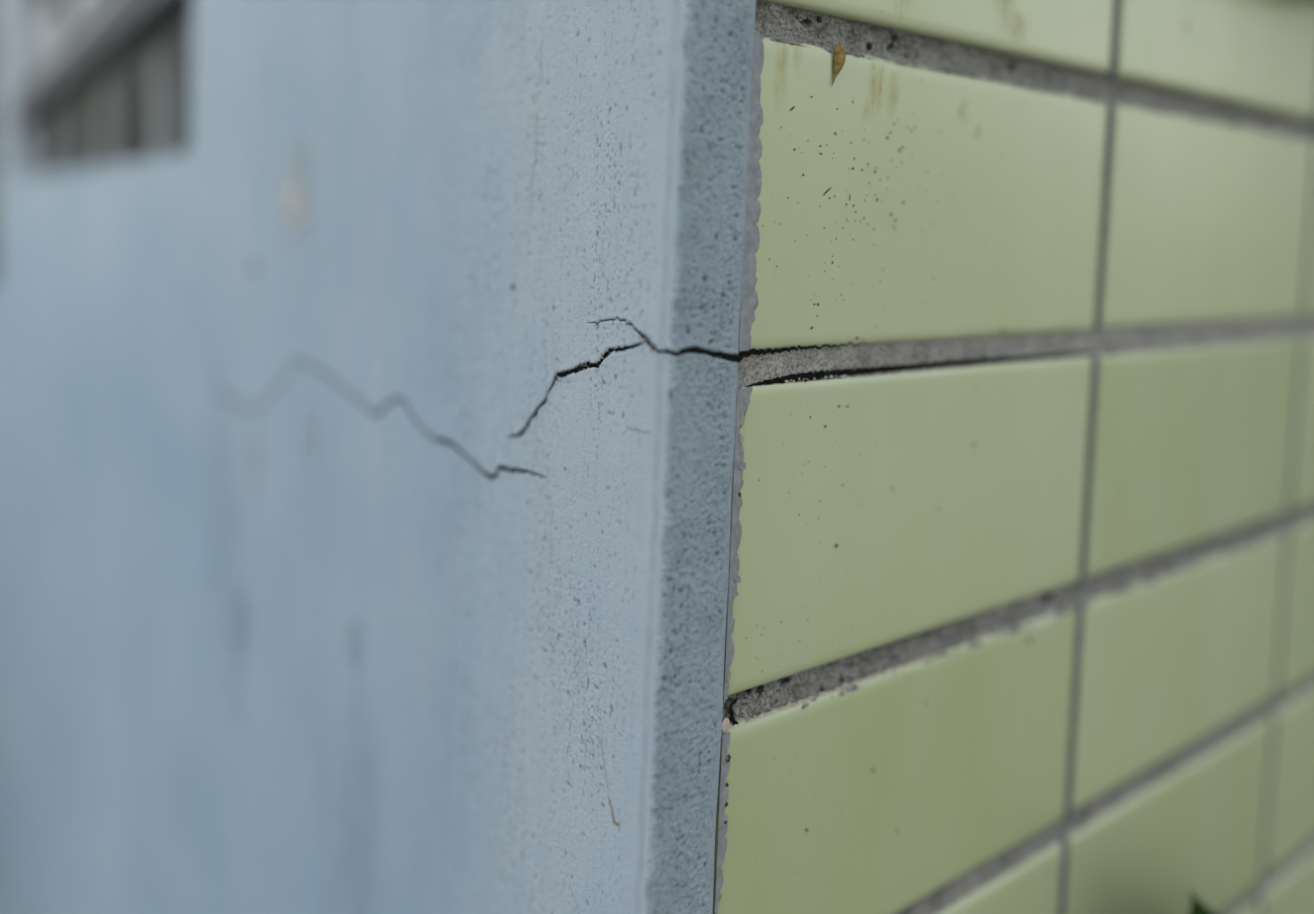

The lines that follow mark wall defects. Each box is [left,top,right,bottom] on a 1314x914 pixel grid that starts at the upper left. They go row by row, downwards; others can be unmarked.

crack [182,284,1095,480]